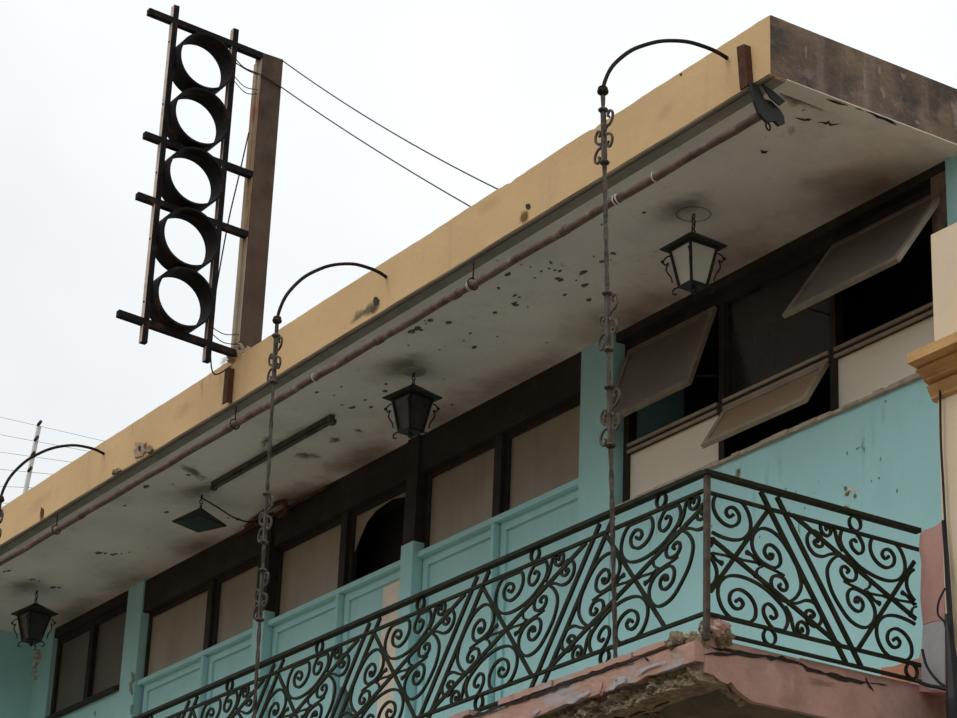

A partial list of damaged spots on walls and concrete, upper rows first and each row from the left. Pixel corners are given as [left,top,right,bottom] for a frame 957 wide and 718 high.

spalling [532,617,746,718]